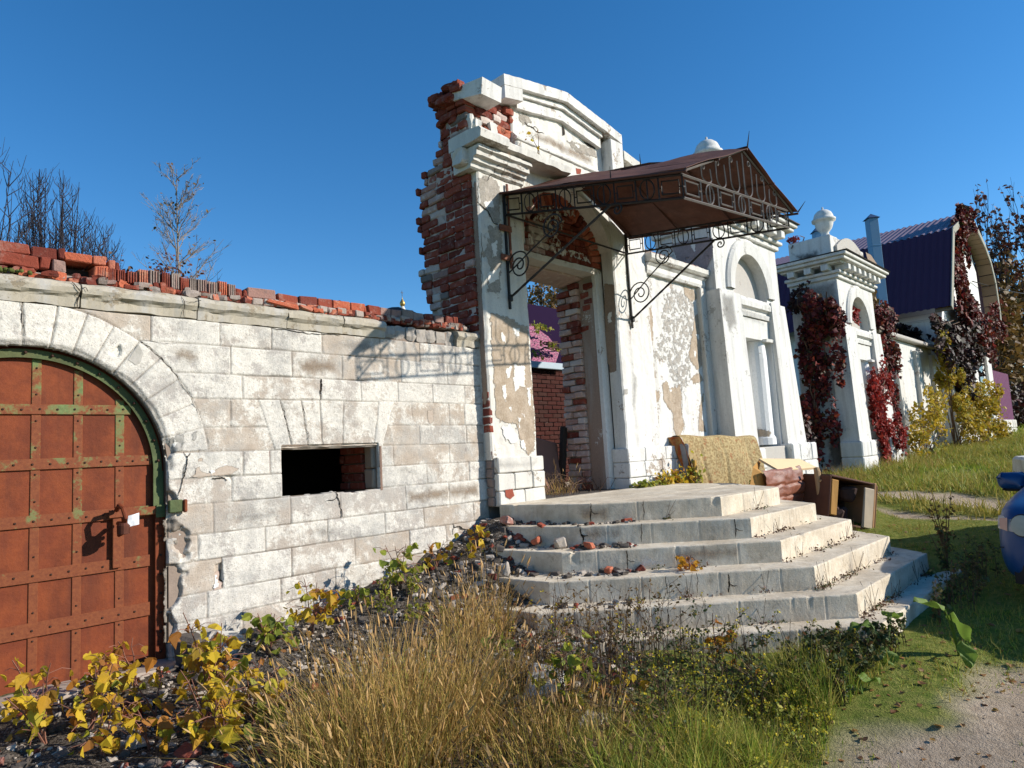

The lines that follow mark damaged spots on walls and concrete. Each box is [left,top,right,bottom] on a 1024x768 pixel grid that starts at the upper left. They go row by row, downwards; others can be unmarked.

spalling [427,82,463,110]
peeling [471,175,536,456]
peeling [649,286,706,435]
crack [178,452,190,496]
spalling [163,519,186,545]
spalling [213,571,223,590]
spalling [163,568,179,642]